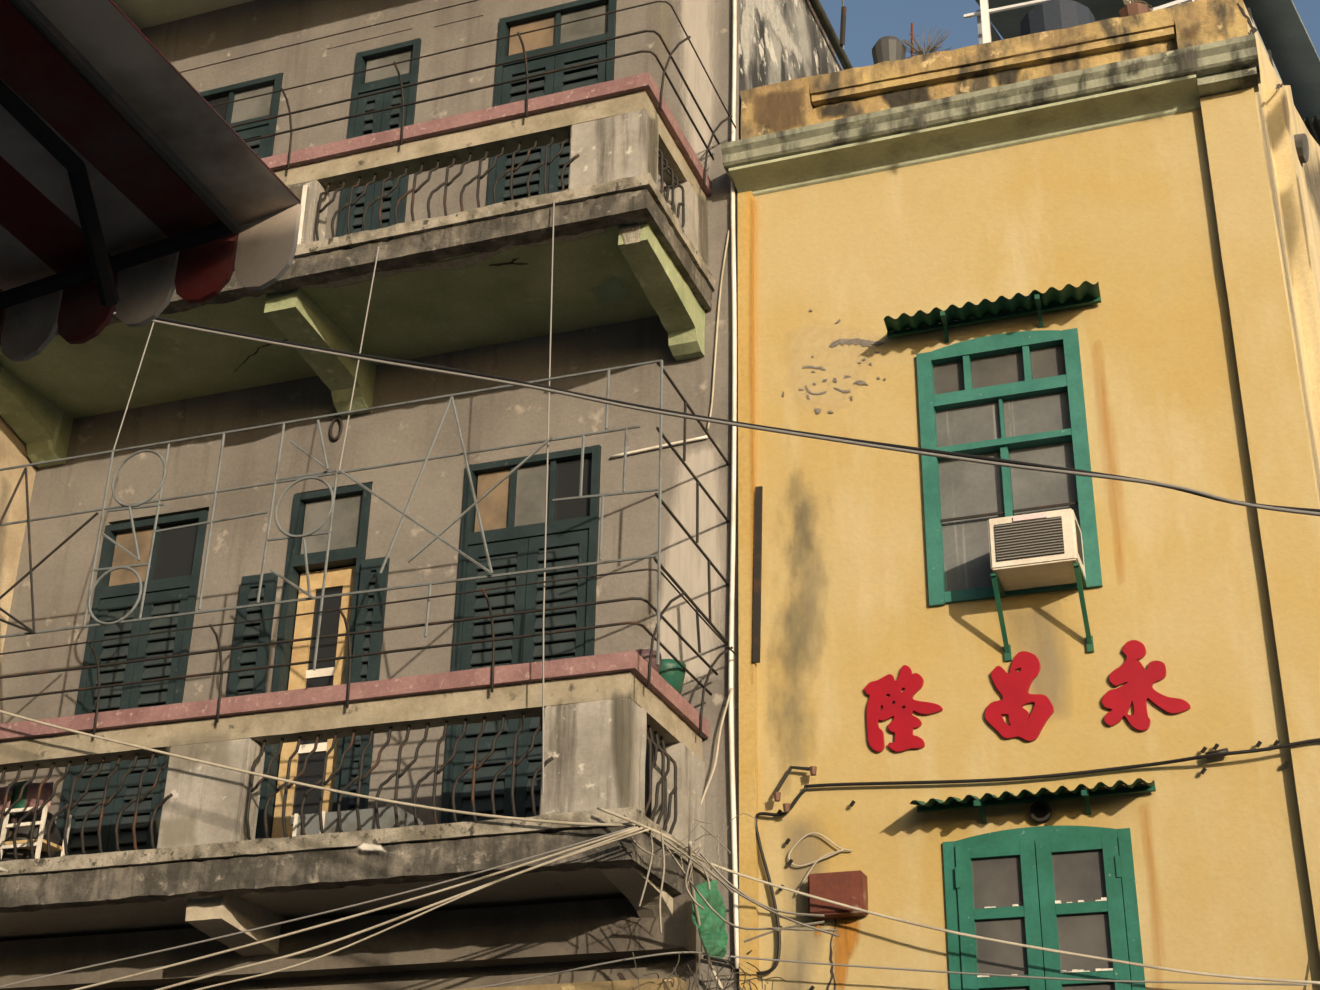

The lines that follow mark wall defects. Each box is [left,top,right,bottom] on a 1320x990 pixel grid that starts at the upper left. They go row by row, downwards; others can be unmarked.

peeling [782,319,886,414]
rust [835,917,858,988]